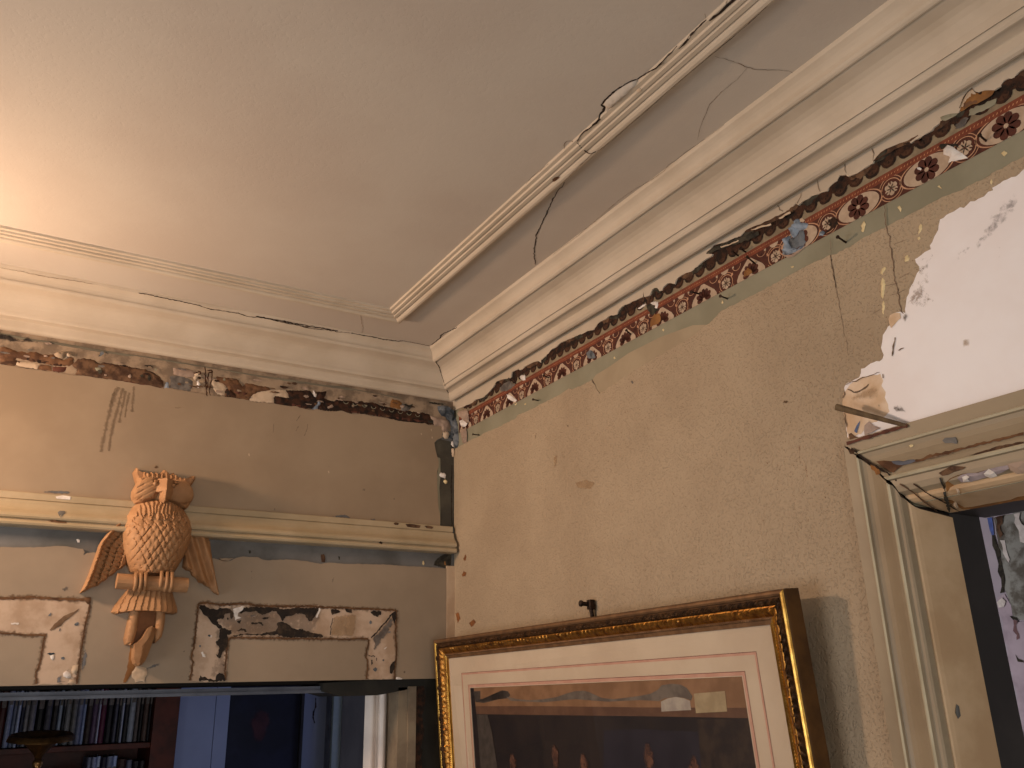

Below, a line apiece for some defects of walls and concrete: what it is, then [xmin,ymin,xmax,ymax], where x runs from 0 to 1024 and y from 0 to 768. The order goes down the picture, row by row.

crack [530,0,768,265]
crack [874,206,909,314]
flaking render [0,330,469,457]
crack [139,293,448,392]
peeling [946,461,1024,733]